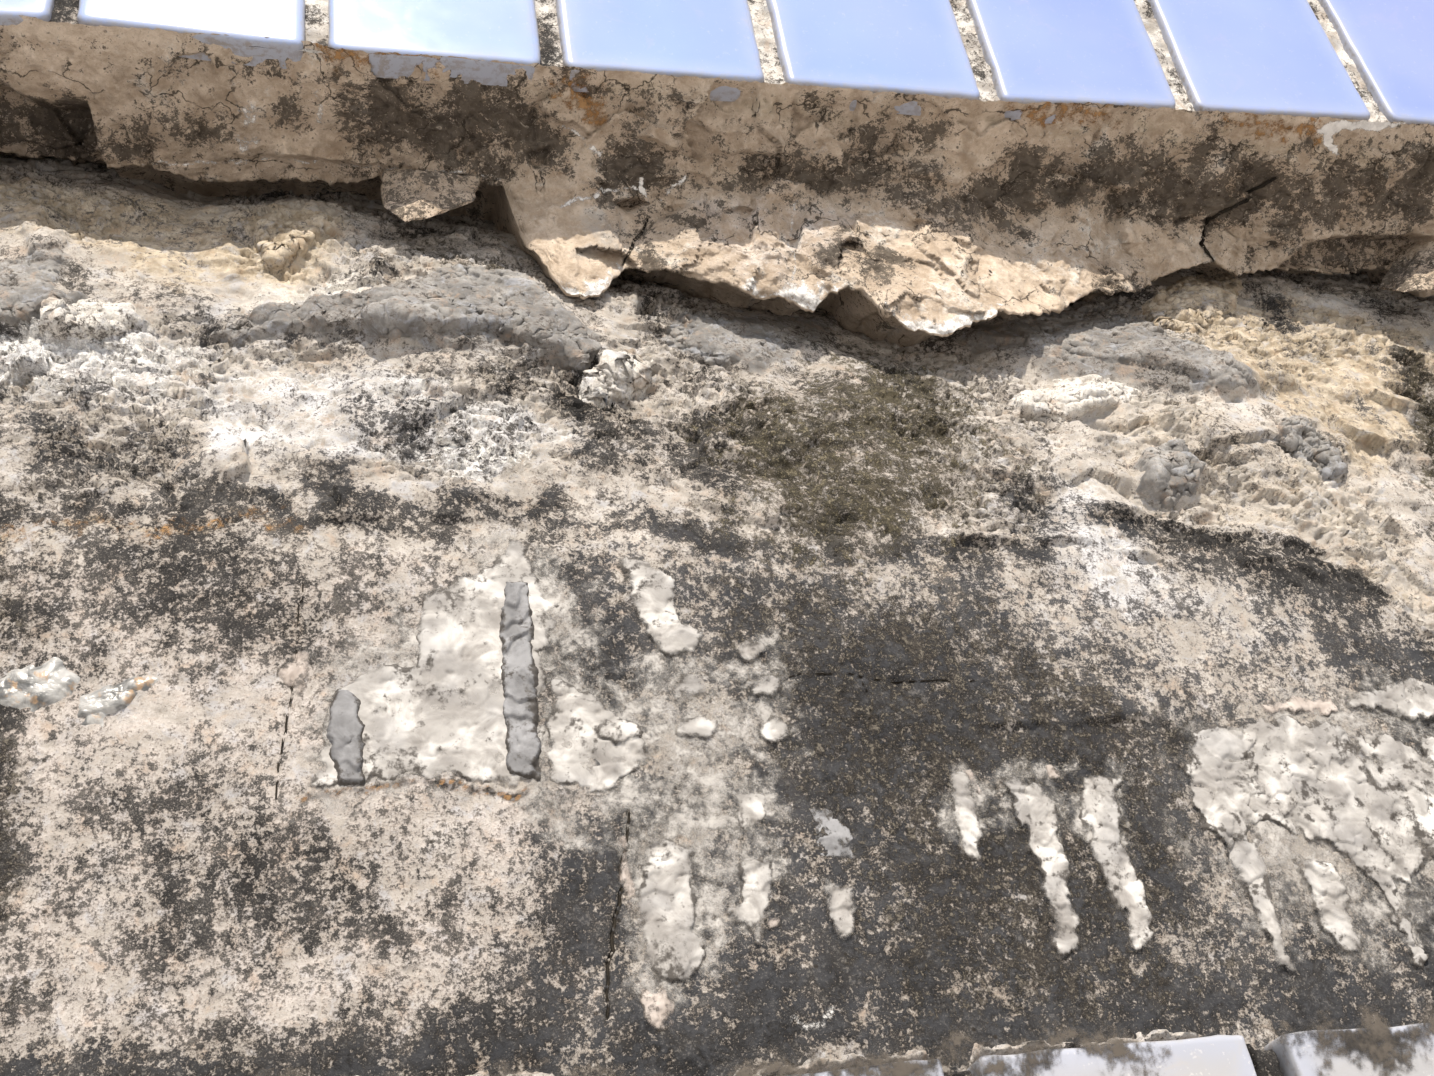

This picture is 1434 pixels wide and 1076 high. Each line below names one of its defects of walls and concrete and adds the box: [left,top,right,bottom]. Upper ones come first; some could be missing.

spalling [0,15,1434,658]
crack [1199,176,1279,262]
leakage [0,739,24,942]
peeling [0,501,1434,1076]
leakage [686,343,1236,1034]